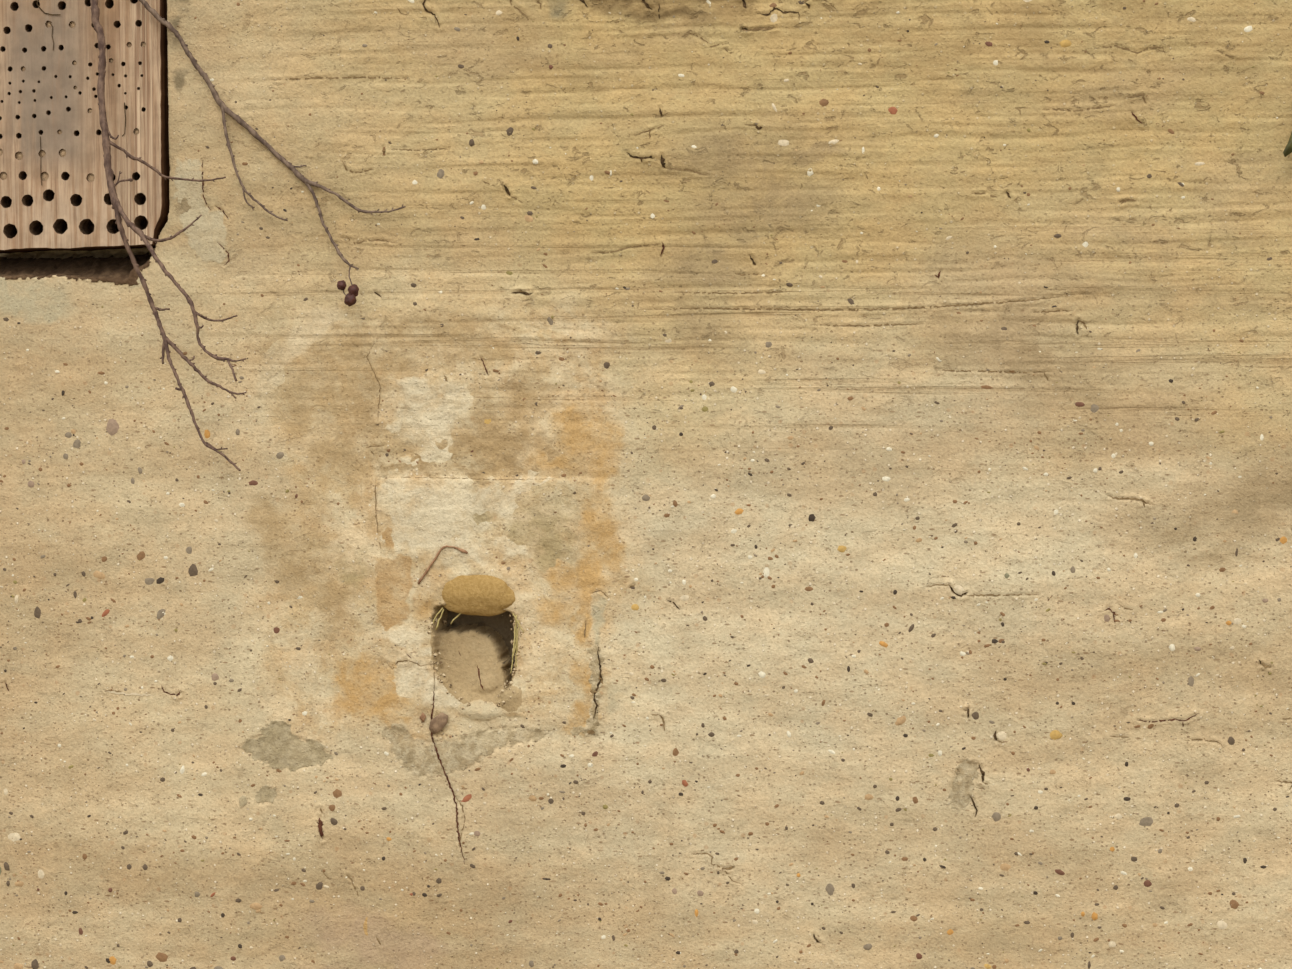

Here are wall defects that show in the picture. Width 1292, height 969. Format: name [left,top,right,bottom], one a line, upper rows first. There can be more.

crack [397,0,439,25]
crack [387,650,484,864]
spalling [380,644,605,779]
crack [584,623,603,735]